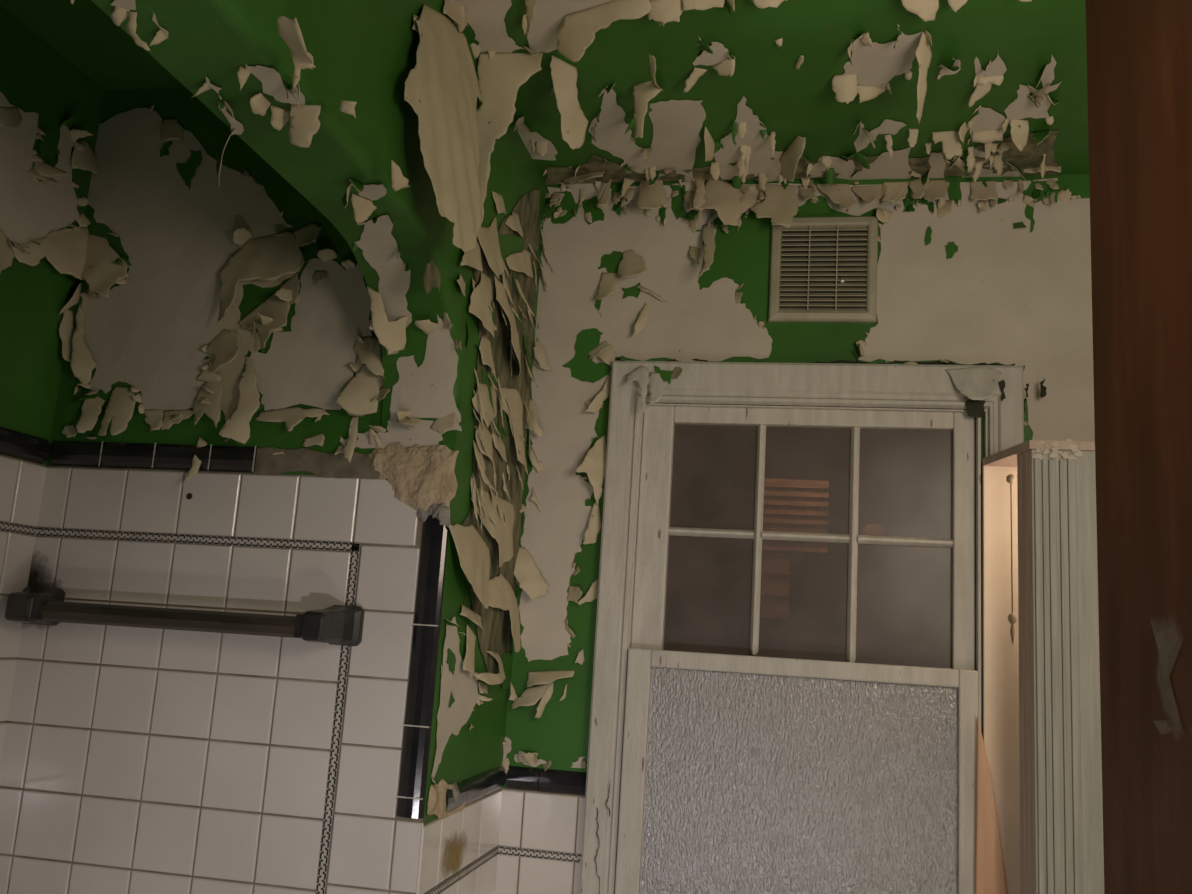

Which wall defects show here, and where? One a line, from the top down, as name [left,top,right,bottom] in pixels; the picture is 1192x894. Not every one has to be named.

peeling [111,0,169,51]
peeling [237,16,321,148]
peeling [0,77,412,478]
peeling [182,435,207,487]
peeling [355,0,1095,820]